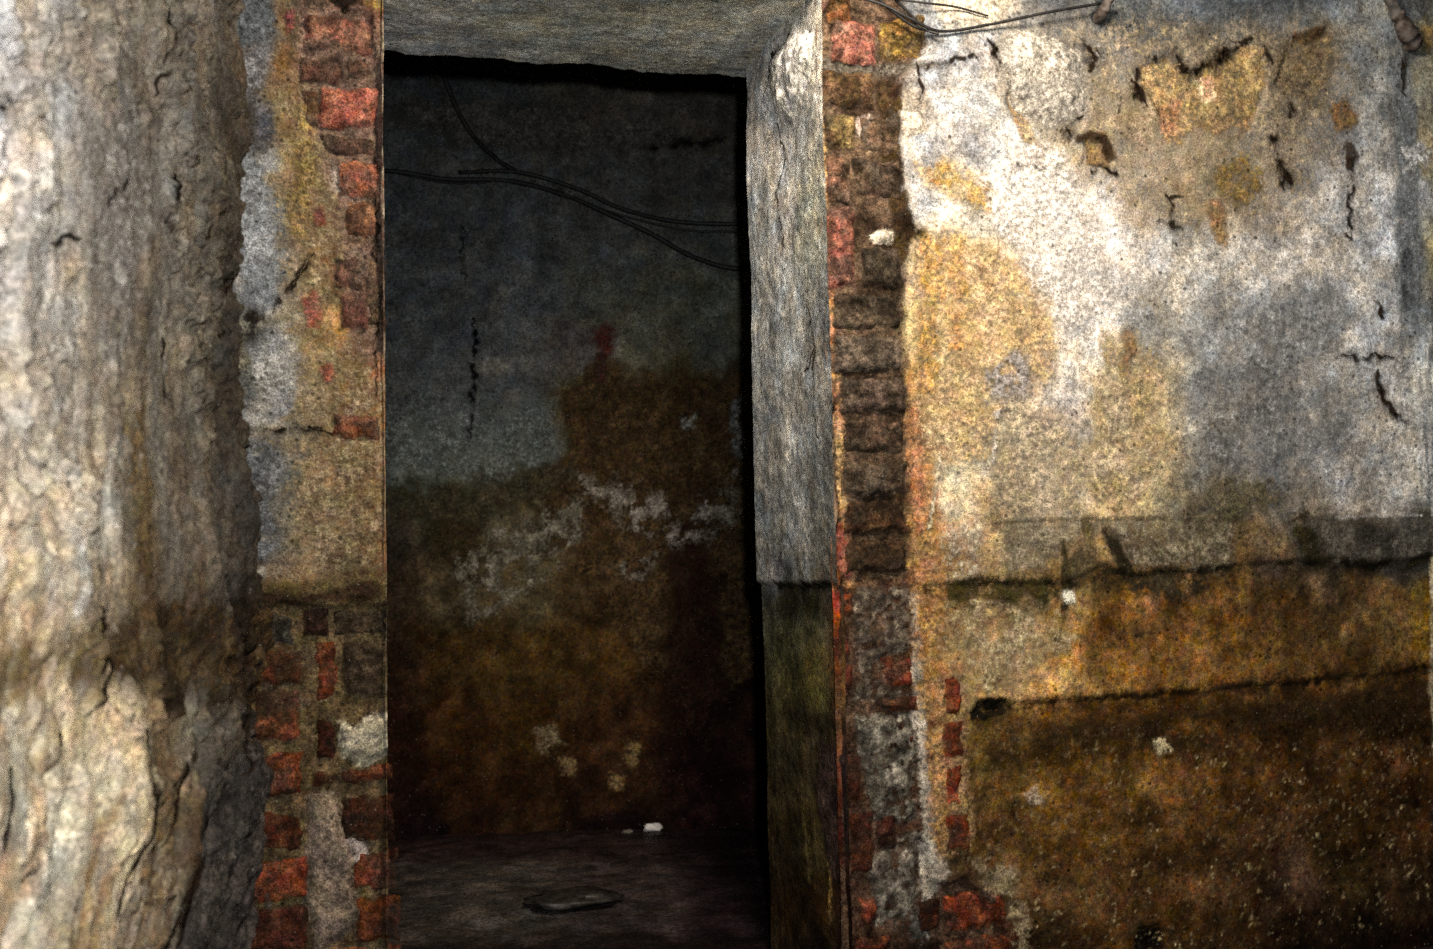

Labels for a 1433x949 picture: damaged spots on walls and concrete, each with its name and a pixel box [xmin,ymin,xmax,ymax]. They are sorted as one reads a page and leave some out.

flaking render [1139,26,1334,145]
flaking render [1205,155,1265,246]
crack [1344,157,1355,240]
flaking render [273,0,388,583]
crack [466,317,479,439]
crack [1337,299,1409,423]
flaking render [817,0,1163,949]
water stain [385,354,759,762]
water stain [911,271,1433,899]
flaking render [251,600,401,949]
water stain [609,742,641,791]
water stain [972,848,1059,949]